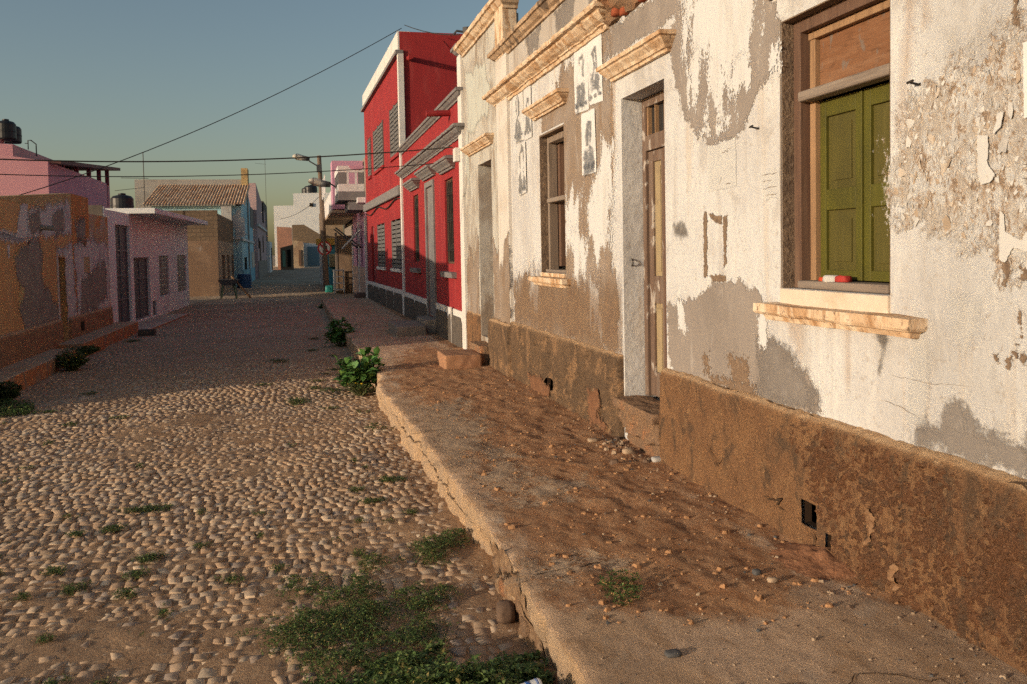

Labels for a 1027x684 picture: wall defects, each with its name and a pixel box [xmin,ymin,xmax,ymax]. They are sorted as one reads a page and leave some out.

flaking render [0,198,111,328]
flaking render [499,0,783,354]
flaking render [872,0,1027,291]
flaking render [667,277,1027,676]
crack [849,673,950,684]